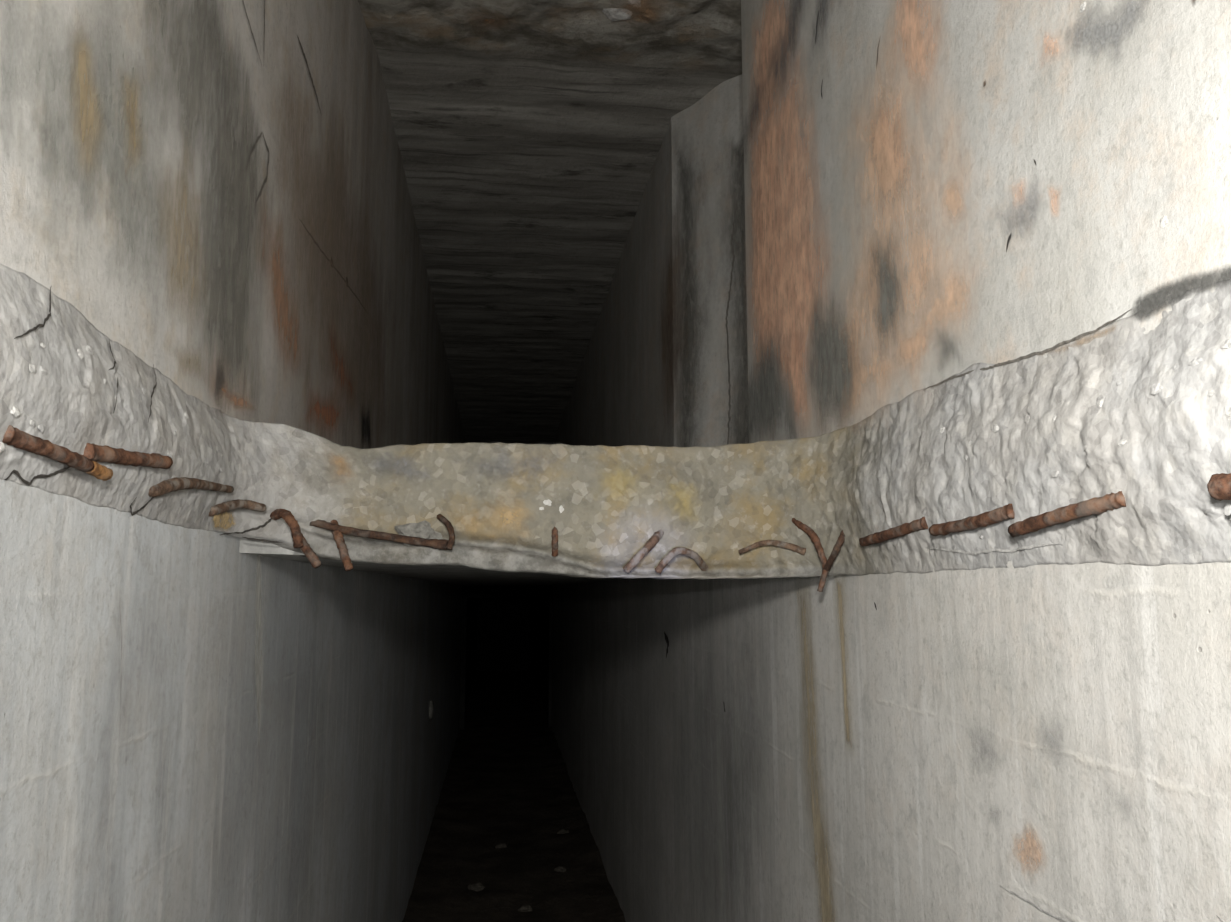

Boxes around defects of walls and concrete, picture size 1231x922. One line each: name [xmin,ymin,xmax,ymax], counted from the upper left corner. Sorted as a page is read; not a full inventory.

damp [36,53,158,254]
damp [153,0,257,395]
spalling [0,264,1231,592]
rust [752,1,817,410]
damp [811,308,852,416]
damp [878,256,897,329]
damp [1133,267,1231,318]